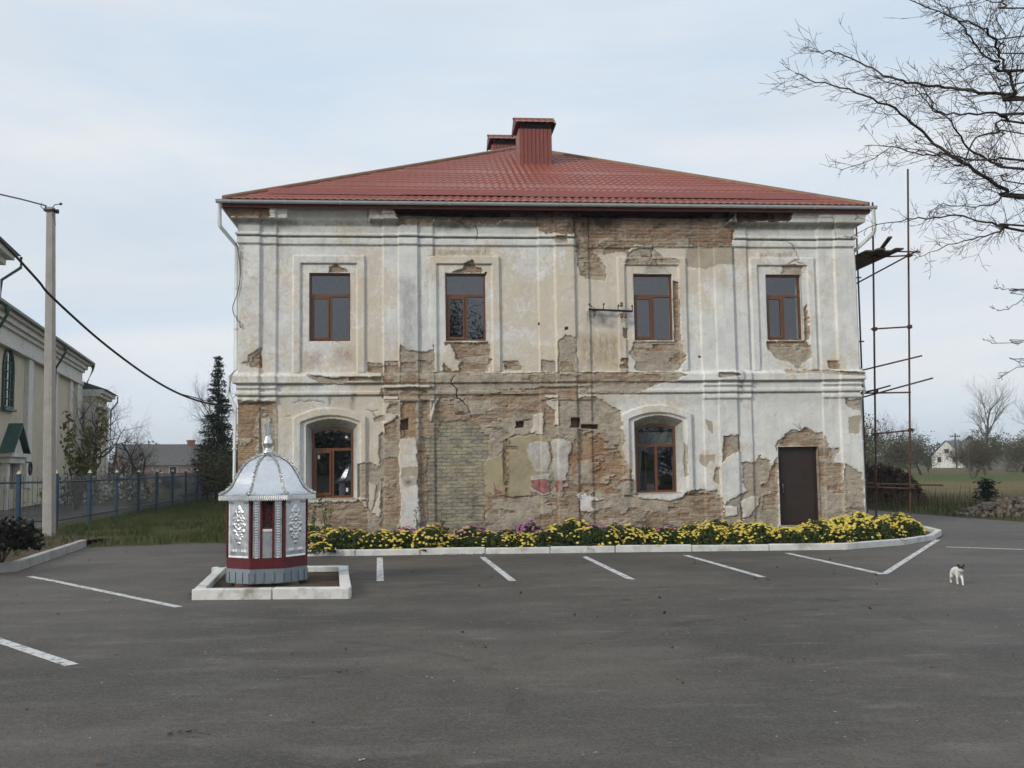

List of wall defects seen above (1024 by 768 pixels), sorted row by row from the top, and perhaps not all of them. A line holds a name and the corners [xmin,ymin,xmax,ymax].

flaking render [395,211,793,281]
flaking render [242,347,263,368]
flaking render [237,399,277,469]
crack [431,378,472,417]
flaking render [308,281,865,535]